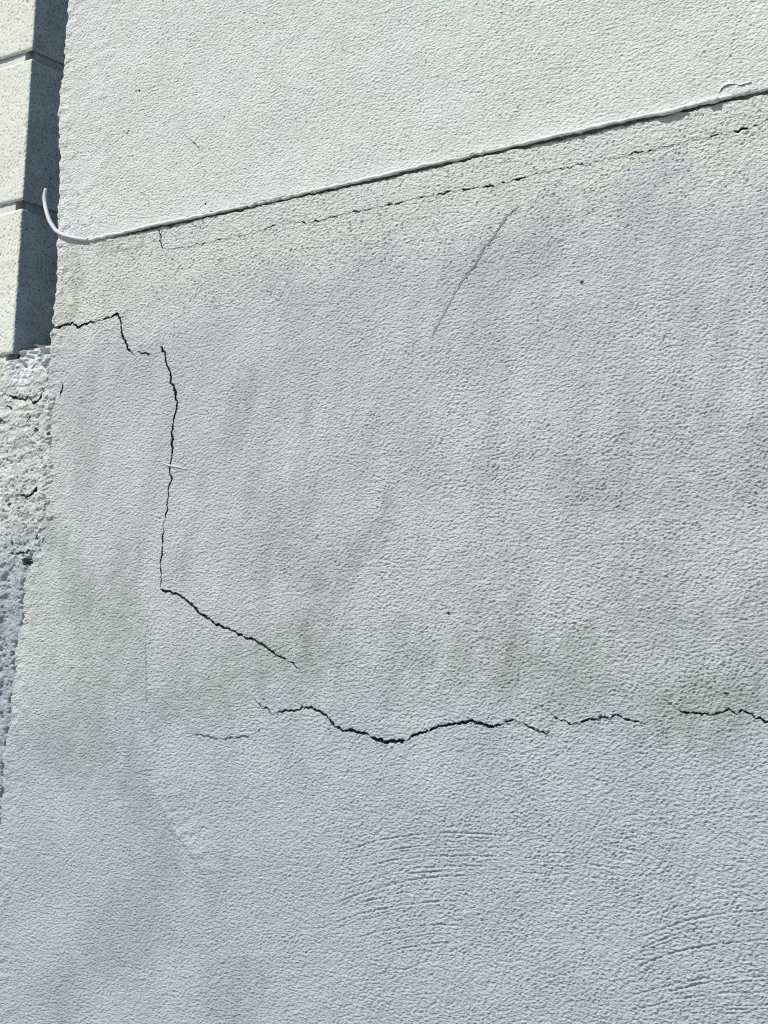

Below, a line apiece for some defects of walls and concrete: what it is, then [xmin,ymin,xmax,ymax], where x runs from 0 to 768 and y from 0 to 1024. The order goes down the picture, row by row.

crack [55,313,300,669]
crack [194,697,645,744]
crack [662,698,768,723]